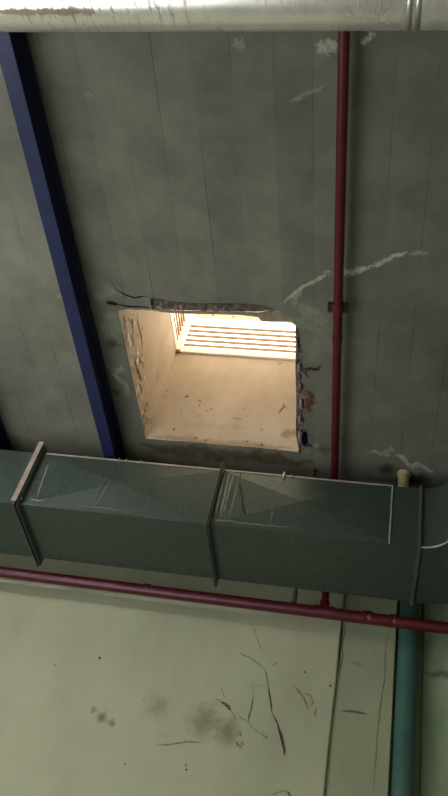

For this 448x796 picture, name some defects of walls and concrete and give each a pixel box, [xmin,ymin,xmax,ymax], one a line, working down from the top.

crack [106,281,151,308]
crack [284,252,421,303]
crack [221,630,286,755]